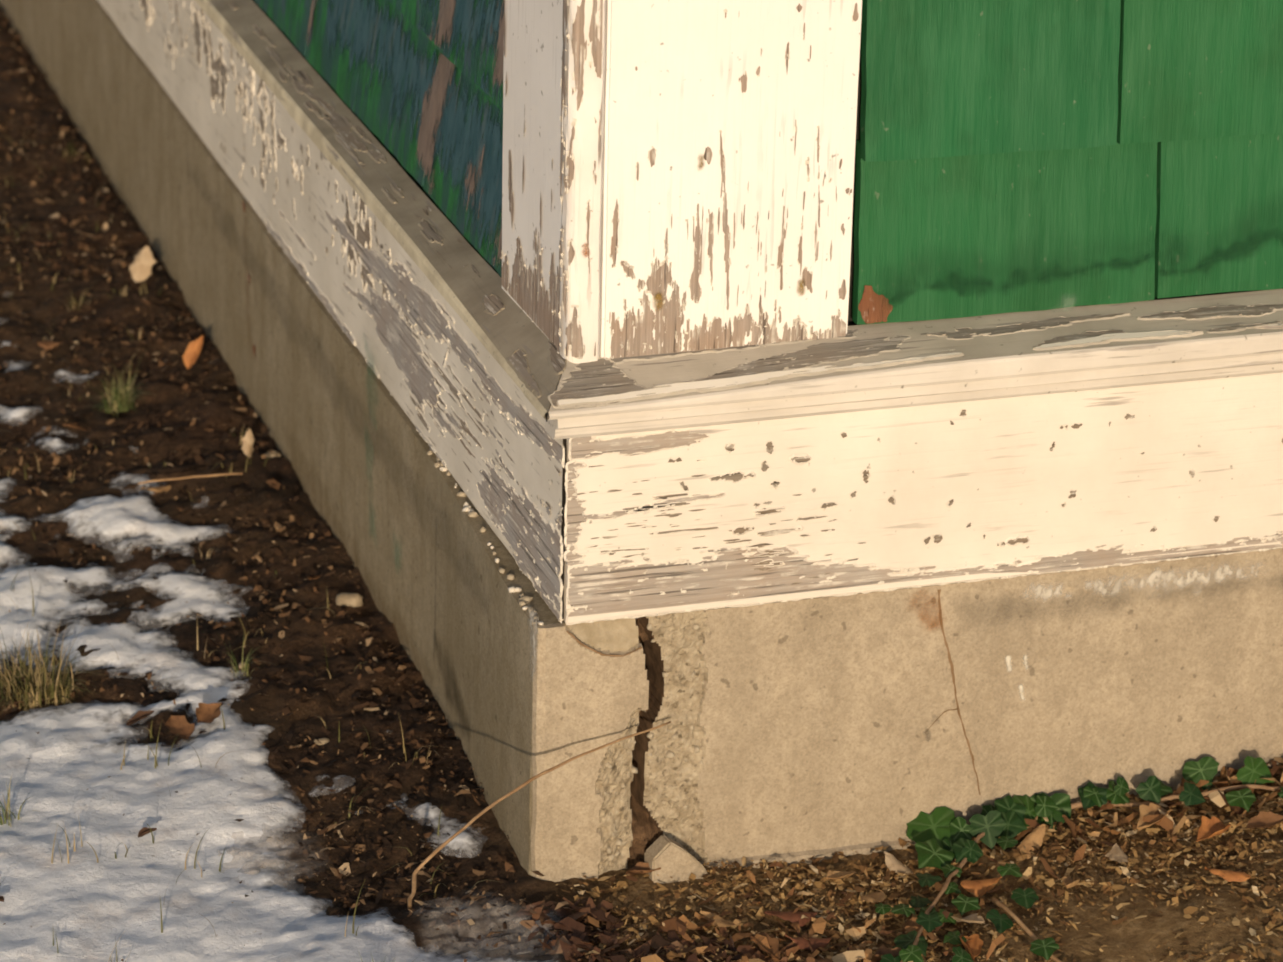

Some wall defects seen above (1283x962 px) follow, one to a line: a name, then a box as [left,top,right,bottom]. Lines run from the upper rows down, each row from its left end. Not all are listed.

peeling [124,0,332,220]
peeling [265,219,380,379]
peeling [306,0,1283,409]
peeling [325,178,1283,876]
crack [627,616,666,866]
crack [926,589,981,795]